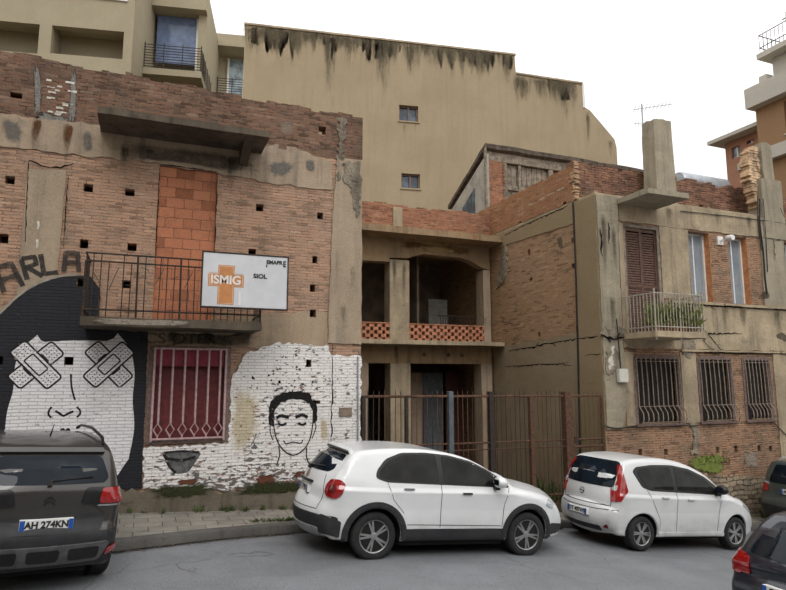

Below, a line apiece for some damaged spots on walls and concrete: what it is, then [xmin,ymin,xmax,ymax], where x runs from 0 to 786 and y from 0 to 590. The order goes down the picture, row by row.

damp [246,28,429,67]
damp [439,47,510,70]
spalling [33,63,77,122]
damp [538,79,575,97]
damp [4,122,20,139]
spalling [335,117,363,217]
crack [505,333,625,367]
flaking render [600,325,625,375]
peeling [268,350,325,392]
peeling [256,475,275,484]